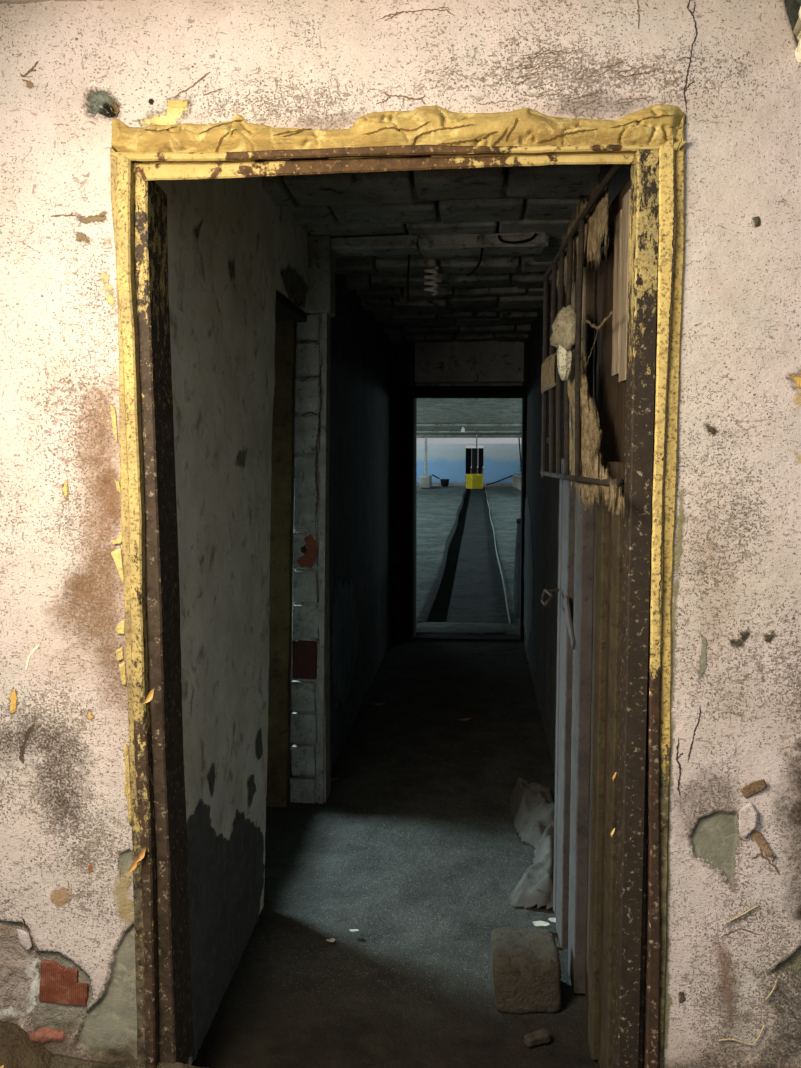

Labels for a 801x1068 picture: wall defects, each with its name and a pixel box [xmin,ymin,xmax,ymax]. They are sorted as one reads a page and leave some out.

spalling [83,88,122,118]
crack [477,46,660,105]
peeling [101,271,115,308]
crack [658,0,697,631]
peeling [111,531,124,583]
spalling [297,535,318,568]
peeling [116,647,126,686]
peeling [124,744,132,826]
damp [786,746,801,873]
spalling [24,849,137,1062]
spalling [762,947,801,1068]